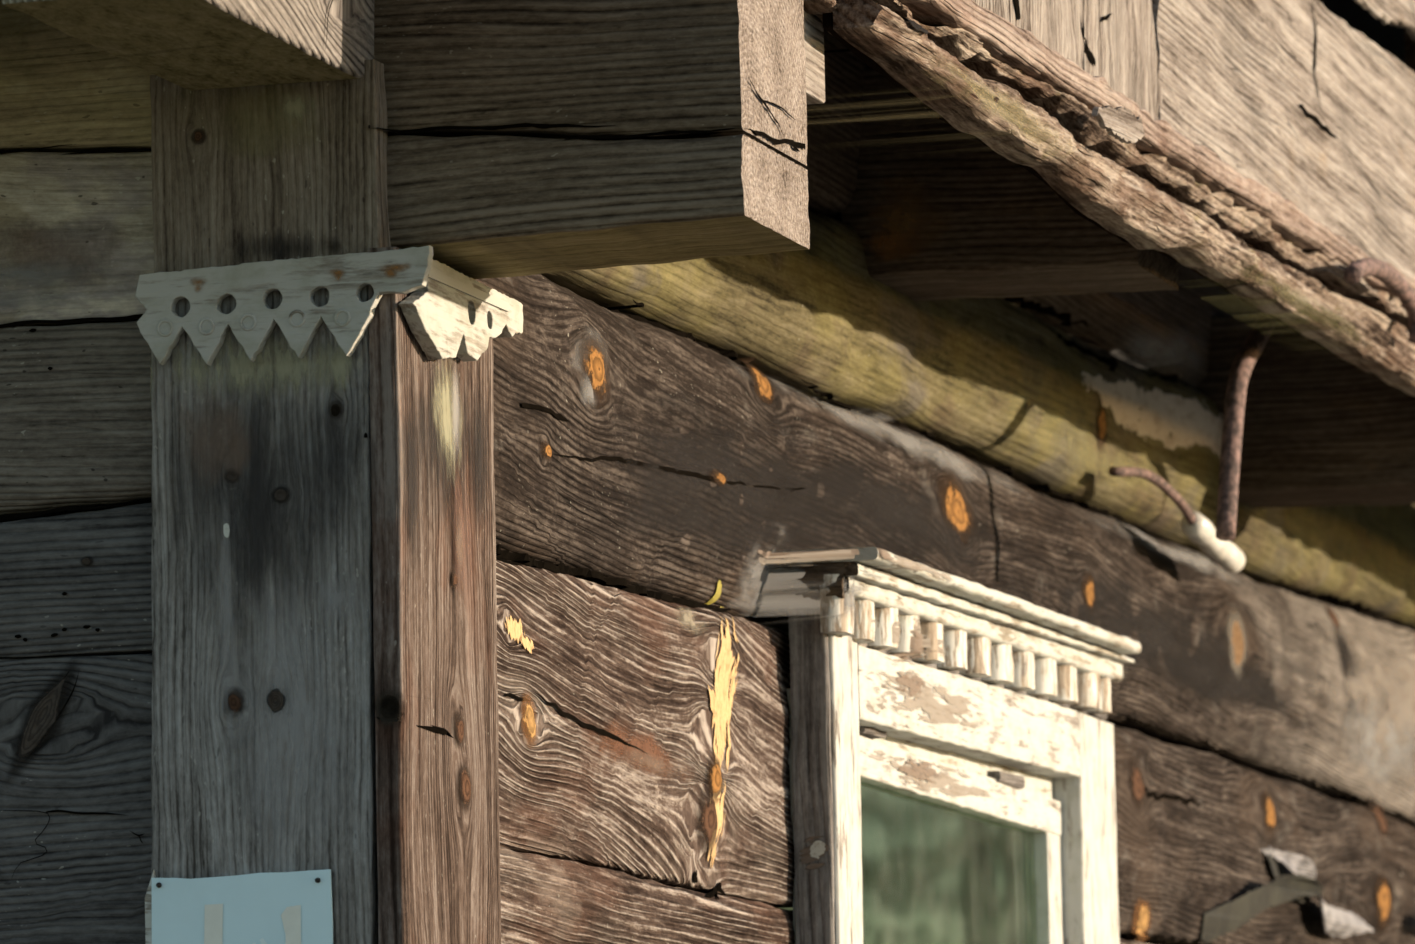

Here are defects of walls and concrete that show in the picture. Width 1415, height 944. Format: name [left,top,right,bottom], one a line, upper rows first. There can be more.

crack [0,144,151,155]
crack [369,76,805,152]
crack [522,403,807,490]
leakage [180,416,344,649]
peeling [859,615,981,729]
crack [506,691,648,754]
peeling [887,757,991,797]